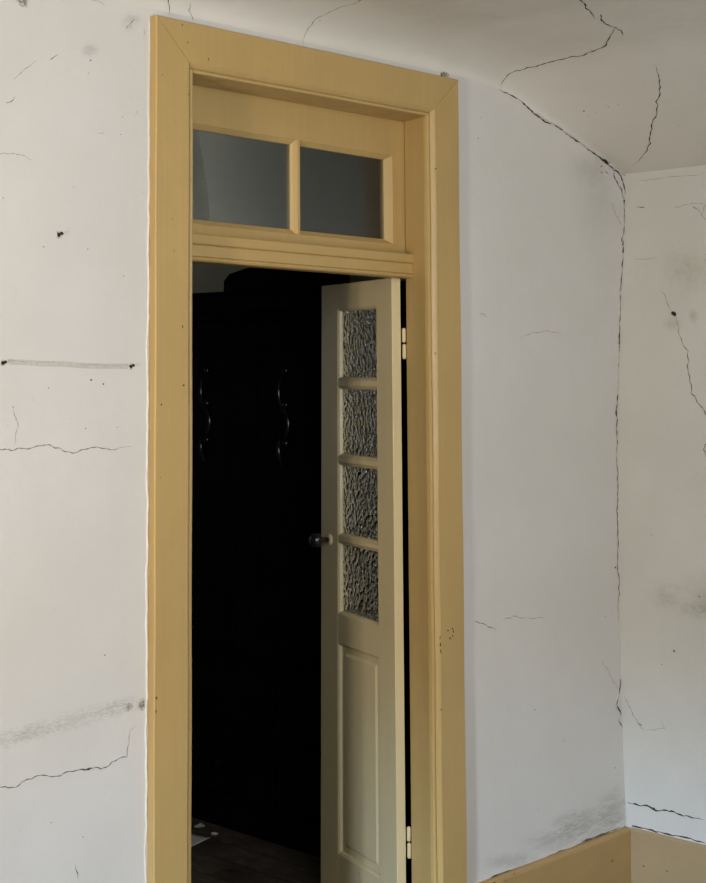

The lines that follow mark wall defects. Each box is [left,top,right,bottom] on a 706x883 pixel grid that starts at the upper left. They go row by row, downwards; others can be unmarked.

crack [501,0,706,618]
crack [0,414,121,453]
crack [0,726,135,788]
crack [628,802,704,820]